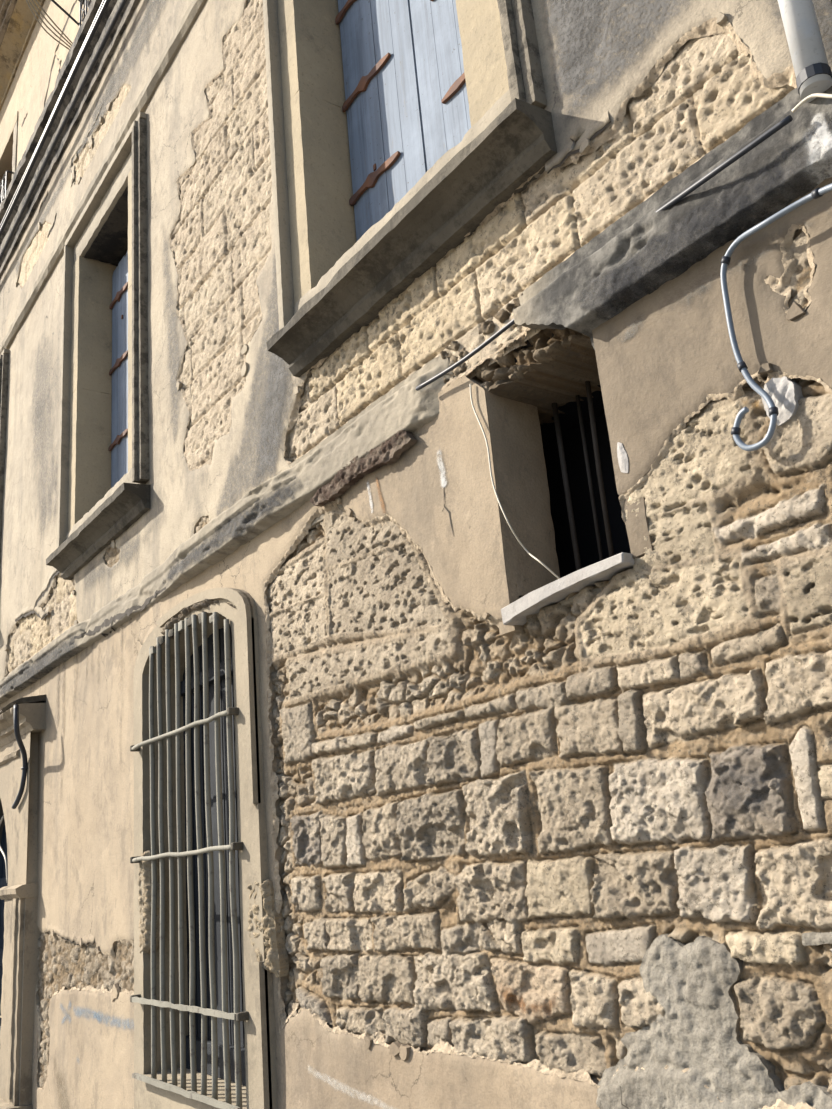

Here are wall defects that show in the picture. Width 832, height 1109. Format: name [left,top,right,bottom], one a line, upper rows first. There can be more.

leakage [548,0,685,116]
leakage [812,0,832,67]
spalling [169,0,272,471]
spalling [283,12,797,468]
spalling [764,224,815,321]
spalling [4,573,78,677]
spalling [247,363,832,1109]
spalling [35,849,160,1092]